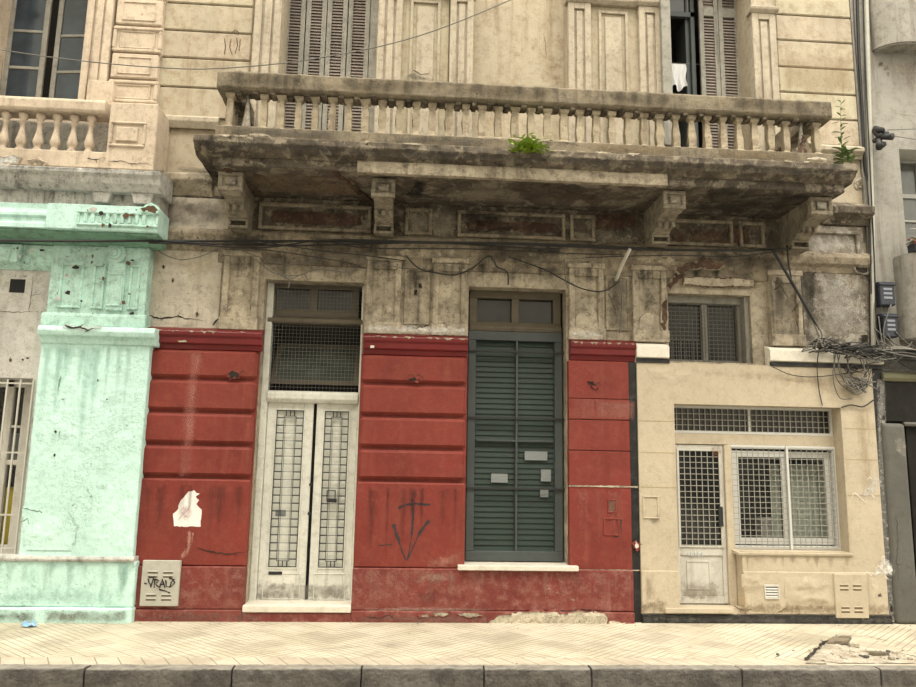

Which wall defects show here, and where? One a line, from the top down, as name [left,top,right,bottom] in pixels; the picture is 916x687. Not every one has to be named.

flaking render [641,255,755,331]
crack [150,313,218,325]
crack [65,324,99,332]
spalling [417,608,629,624]